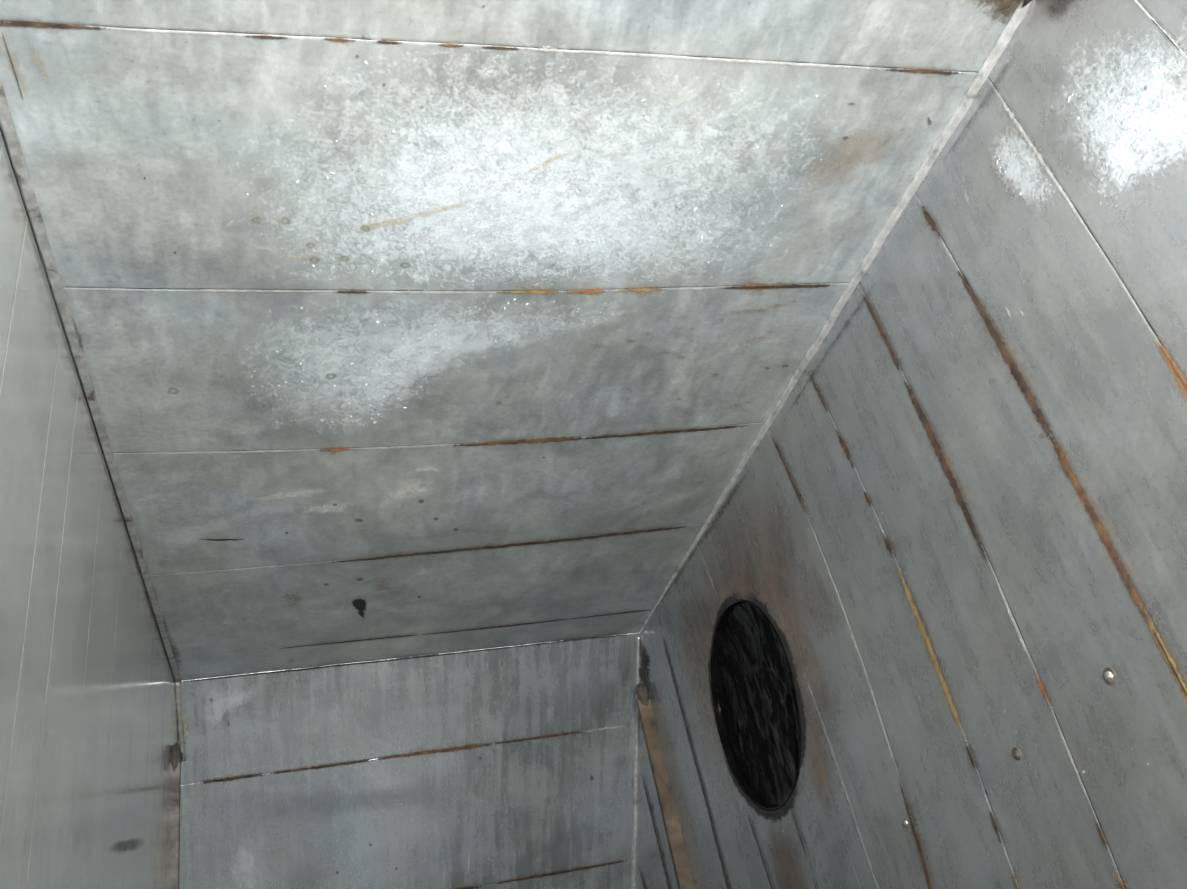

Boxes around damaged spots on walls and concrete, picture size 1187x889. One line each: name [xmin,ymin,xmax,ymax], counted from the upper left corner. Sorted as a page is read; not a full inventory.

rust [921,206,940,237]
rust [453,425,745,446]
rust [836,430,854,468]
rust [863,295,988,563]
rust [958,272,1187,699]
rust [332,526,686,563]
rust [898,570,960,725]
rust [203,731,585,783]
rust [457,861,623,889]